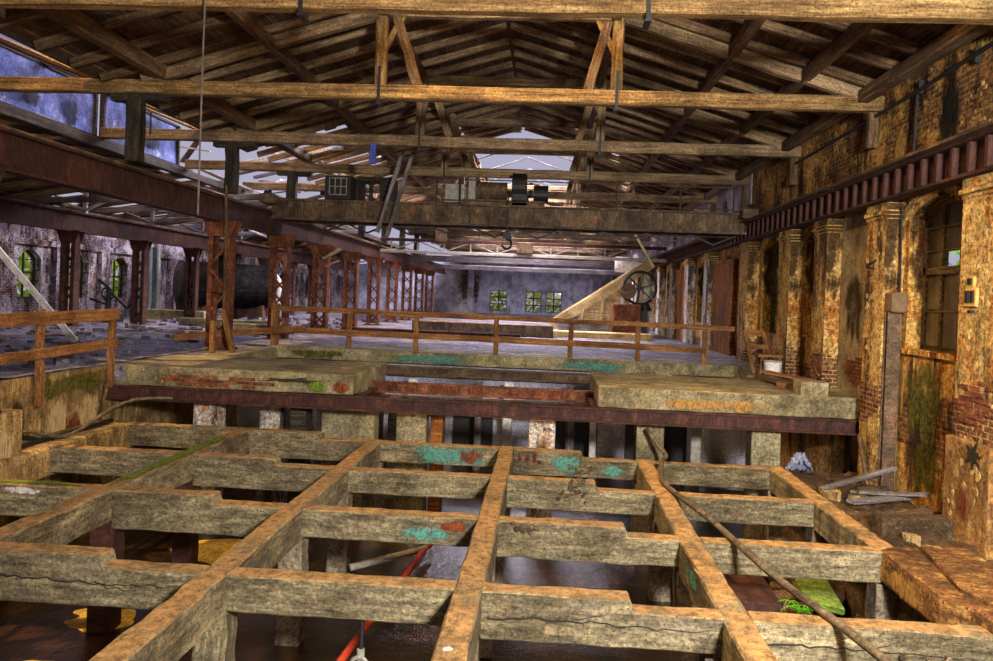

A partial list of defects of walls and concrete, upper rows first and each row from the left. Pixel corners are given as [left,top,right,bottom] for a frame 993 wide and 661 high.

water stain [845,248,867,345]
water stain [898,346,936,501]
spalling [947,381,993,515]